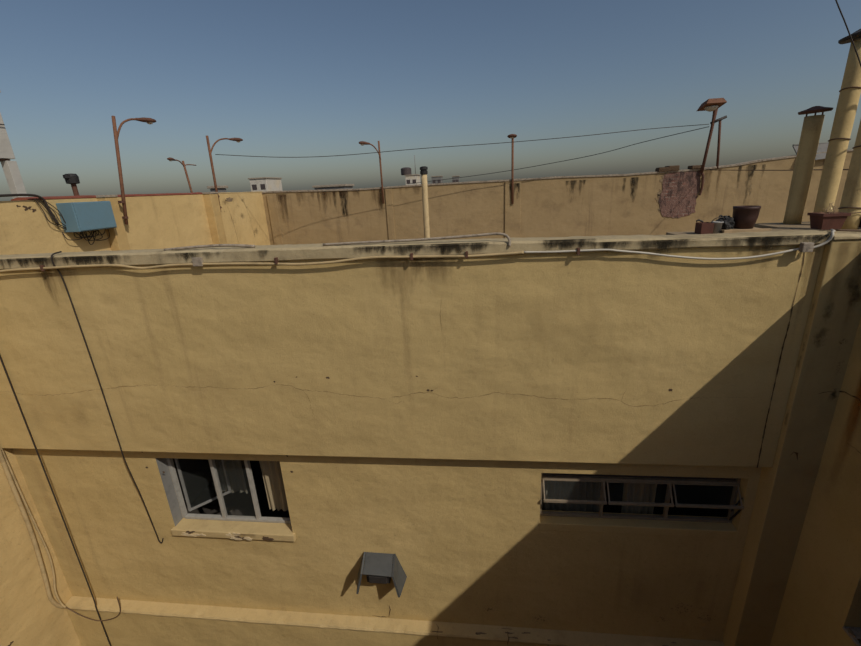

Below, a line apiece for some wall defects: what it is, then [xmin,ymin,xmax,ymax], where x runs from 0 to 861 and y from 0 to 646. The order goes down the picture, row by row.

damp [399,242,487,252]
damp [544,238,630,247]
damp [642,239,688,249]
damp [7,255,117,263]
crack [757,252,805,468]